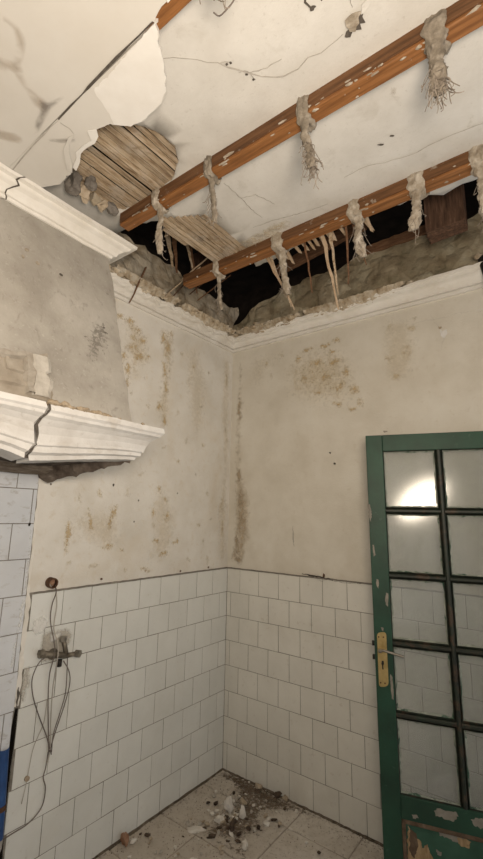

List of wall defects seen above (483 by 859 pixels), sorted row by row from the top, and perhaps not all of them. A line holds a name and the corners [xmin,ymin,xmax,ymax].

crack [1,21,153,200]
peeling [94,23,166,127]
peeling [63,129,98,172]
flaking render [109,264,414,338]
flaking render [0,348,53,401]
crack [24,404,51,458]